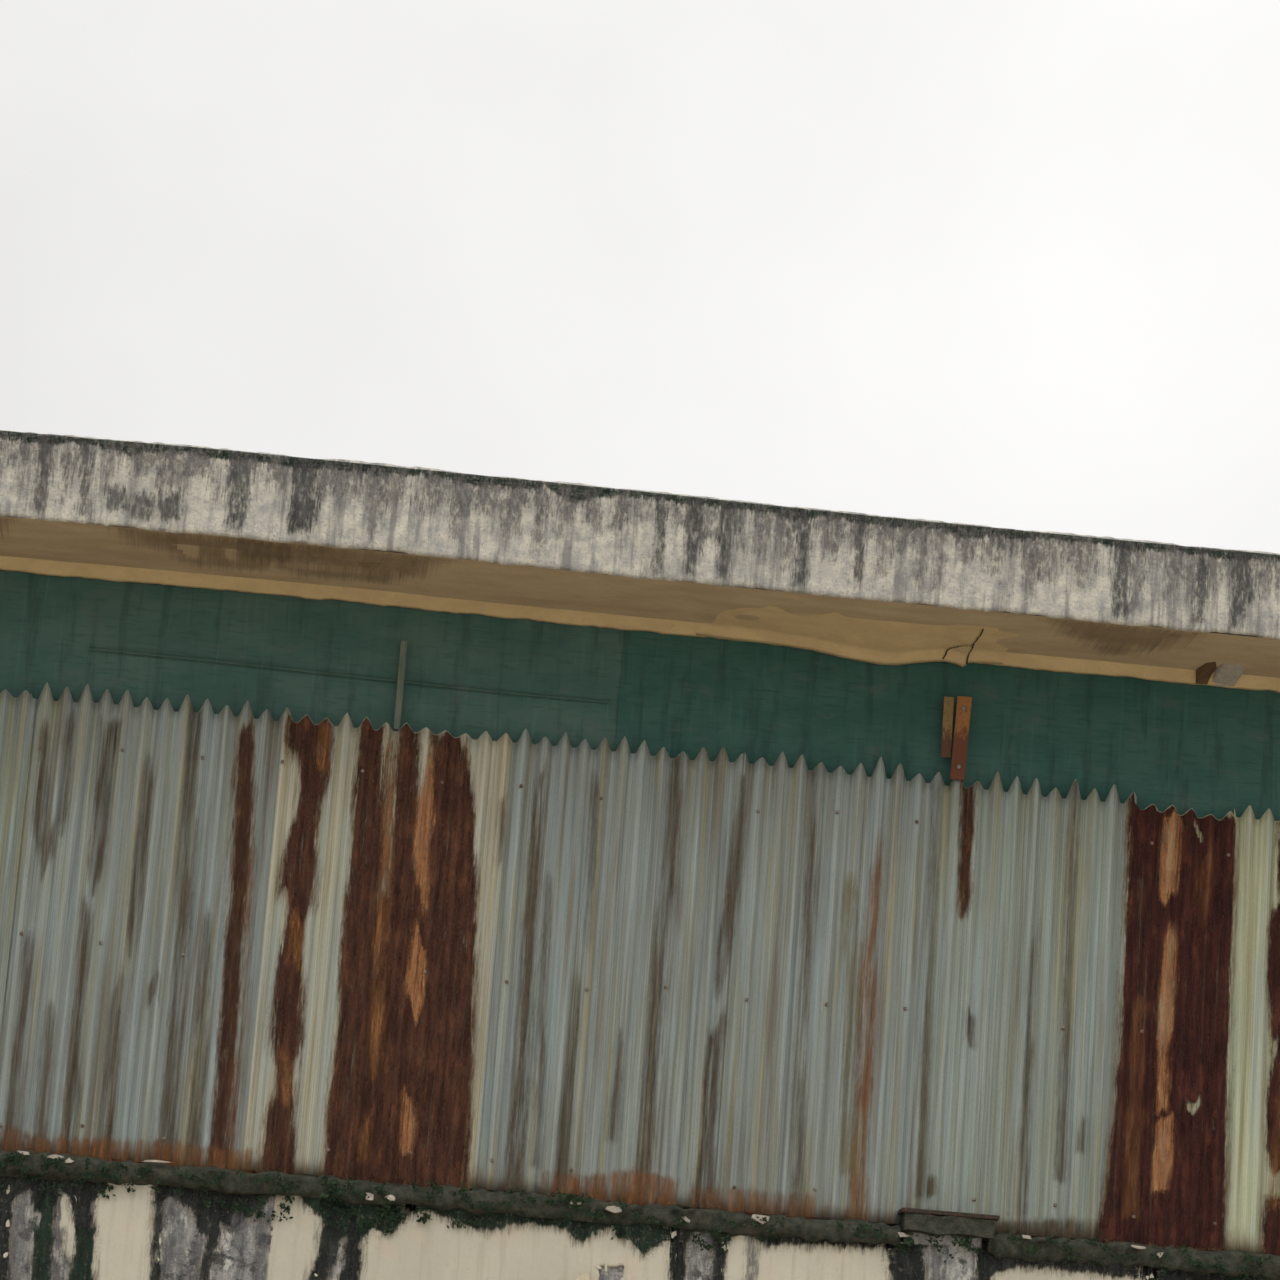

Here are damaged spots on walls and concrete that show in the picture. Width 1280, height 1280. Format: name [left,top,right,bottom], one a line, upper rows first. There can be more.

leakage [0,430,1280,629]
rust [4,712,334,1175]
rust [323,718,480,1189]
rust [996,792,1237,1251]
rust [1260,840,1280,1256]
leakage [0,1176,105,1280]
leakage [150,1185,271,1280]
leakage [301,1196,729,1280]
leakage [745,1236,948,1280]
leakage [973,1247,1261,1280]